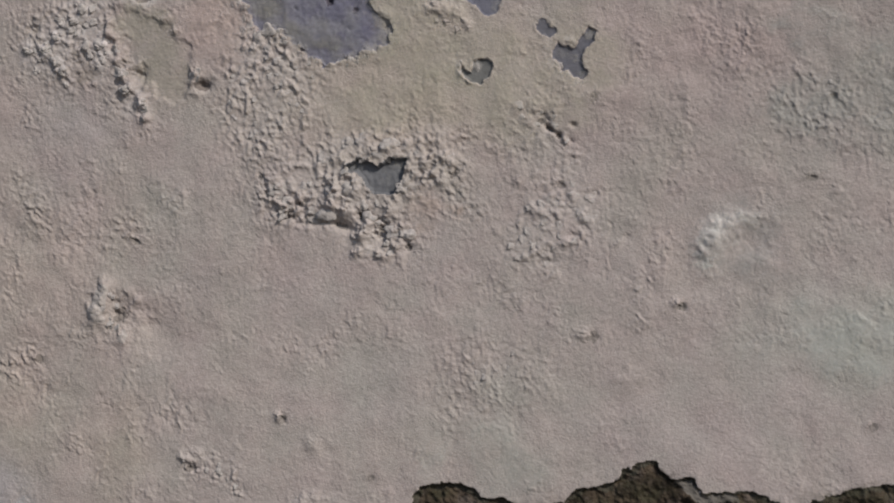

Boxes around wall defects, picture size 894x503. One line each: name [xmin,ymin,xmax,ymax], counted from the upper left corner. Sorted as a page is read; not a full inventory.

peeling [426,0,502,33]
peeling [536,17,596,82]
spalling [218,0,493,267]
spalling [412,481,512,503]
spalling [560,461,780,503]
spalling [812,484,894,503]